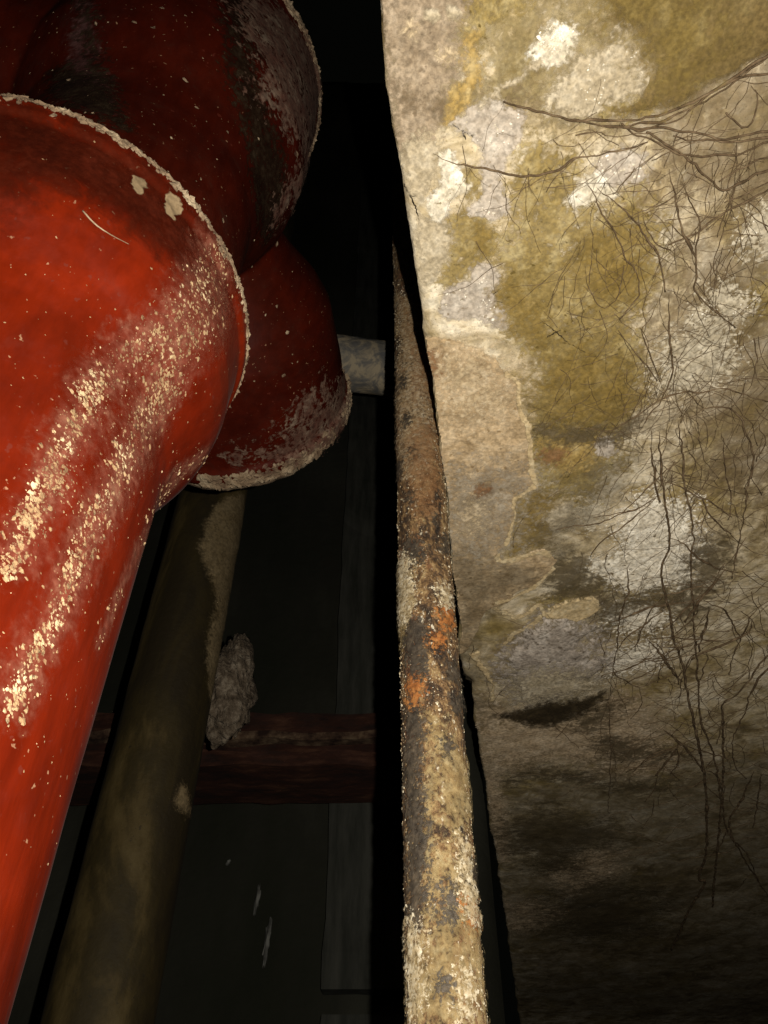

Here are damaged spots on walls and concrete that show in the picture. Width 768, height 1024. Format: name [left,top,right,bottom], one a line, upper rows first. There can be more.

leakage [401,20,650,329]
leakage [729,197,768,265]
rust [427,350,444,378]
leakage [534,274,761,474]
rust [403,673,430,712]
rust [423,604,457,654]
peeling [425,332,626,727]
leakage [475,481,738,946]